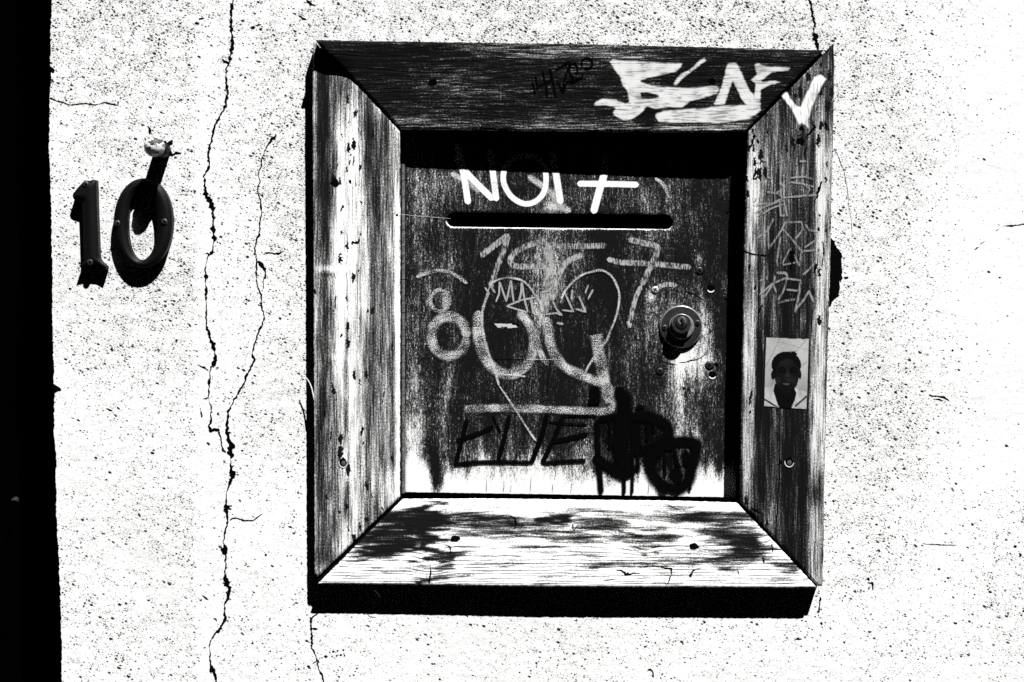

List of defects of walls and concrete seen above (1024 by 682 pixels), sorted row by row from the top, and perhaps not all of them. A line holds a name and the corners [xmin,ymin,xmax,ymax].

crack [809,0,819,50]
crack [50,97,117,105]
crack [198,0,283,682]
crack [310,610,324,682]